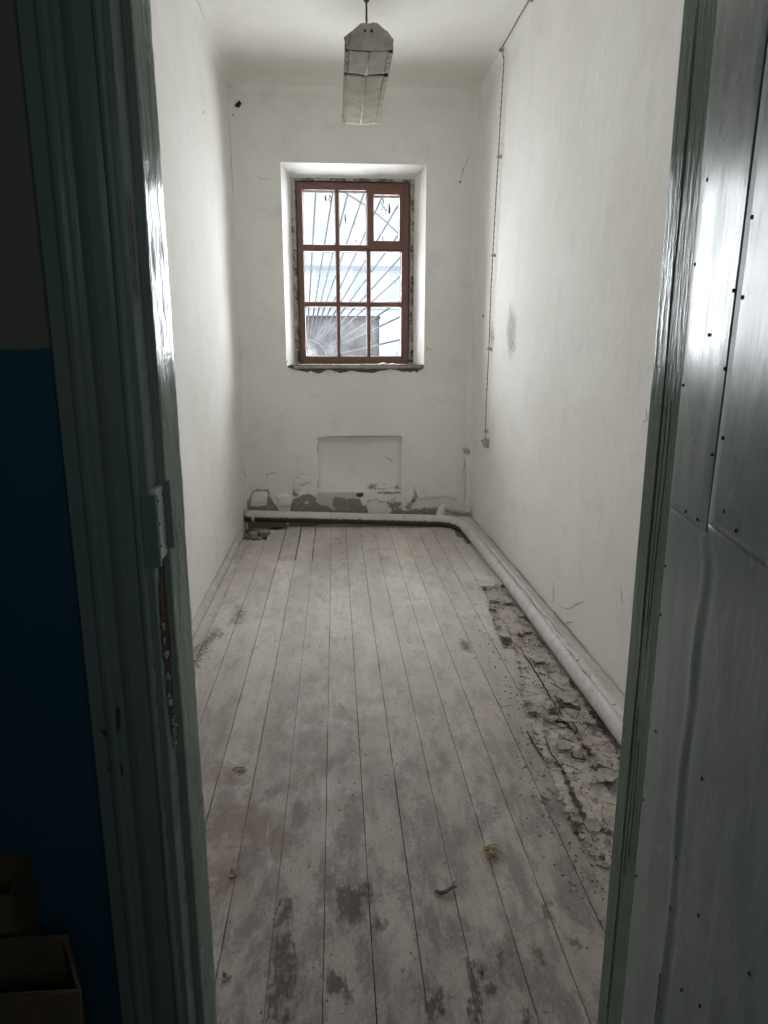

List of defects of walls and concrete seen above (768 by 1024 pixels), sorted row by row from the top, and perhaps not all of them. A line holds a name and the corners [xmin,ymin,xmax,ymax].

flaking render [243,487,368,541]